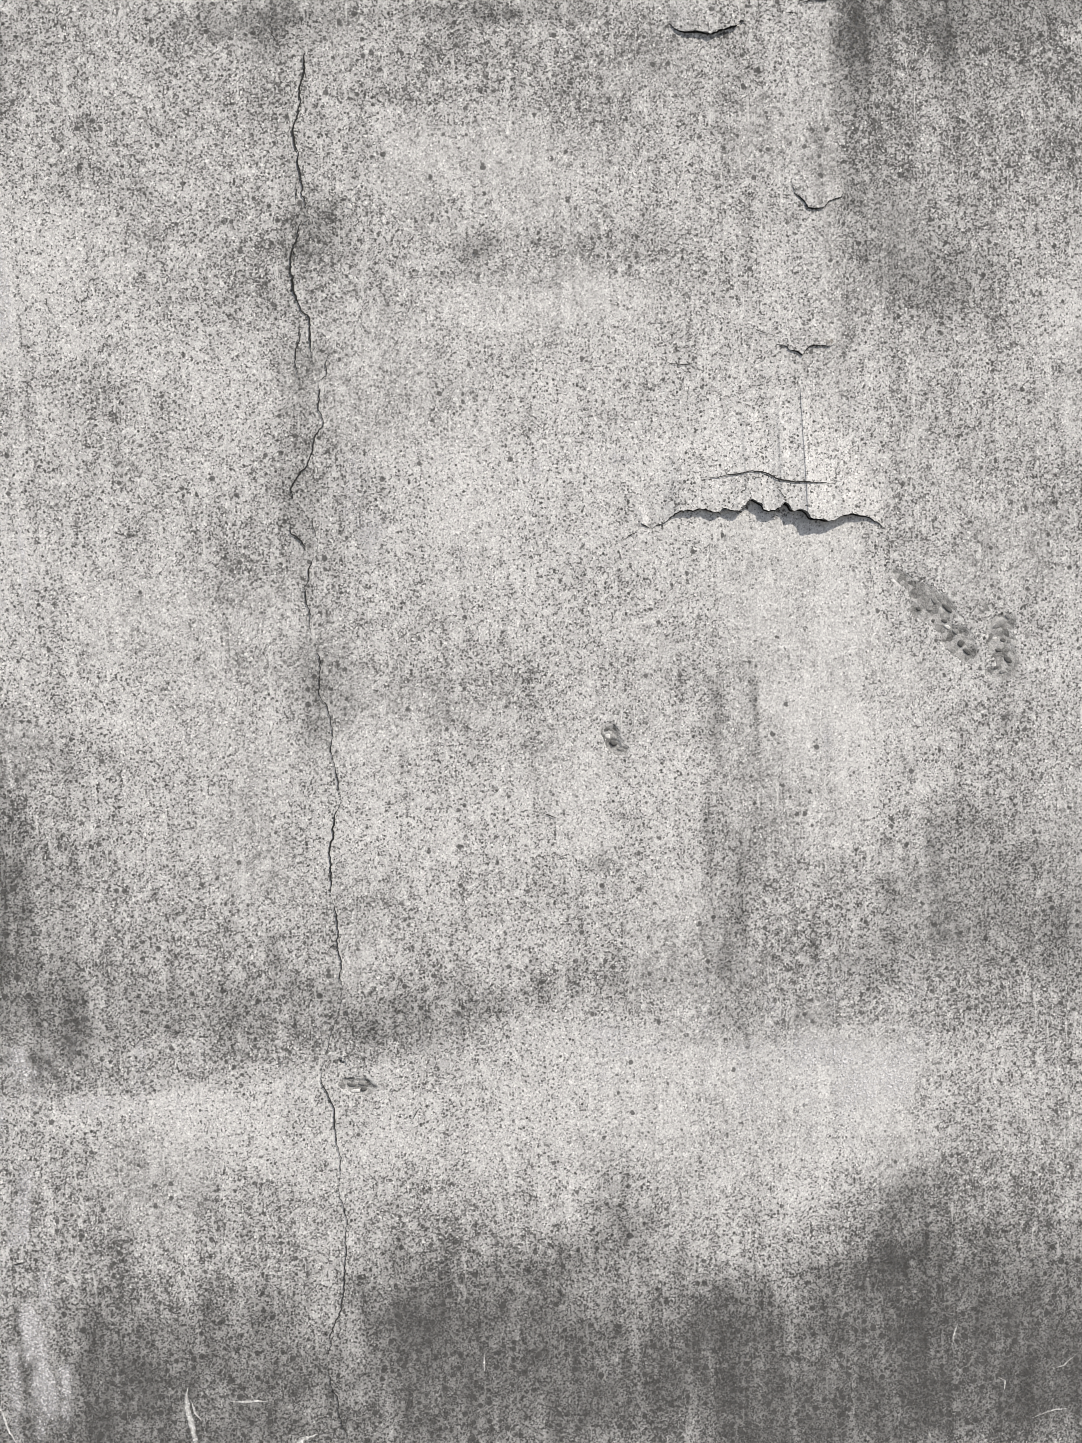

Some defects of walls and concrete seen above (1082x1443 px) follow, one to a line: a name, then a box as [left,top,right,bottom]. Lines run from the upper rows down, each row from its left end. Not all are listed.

peeling [669,0,746,35]
water stain [824,0,1082,123]
water stain [834,167,999,314]
peeling [623,389,884,540]
crack [268,1,349,1442]
water stain [0,1159,1082,1443]